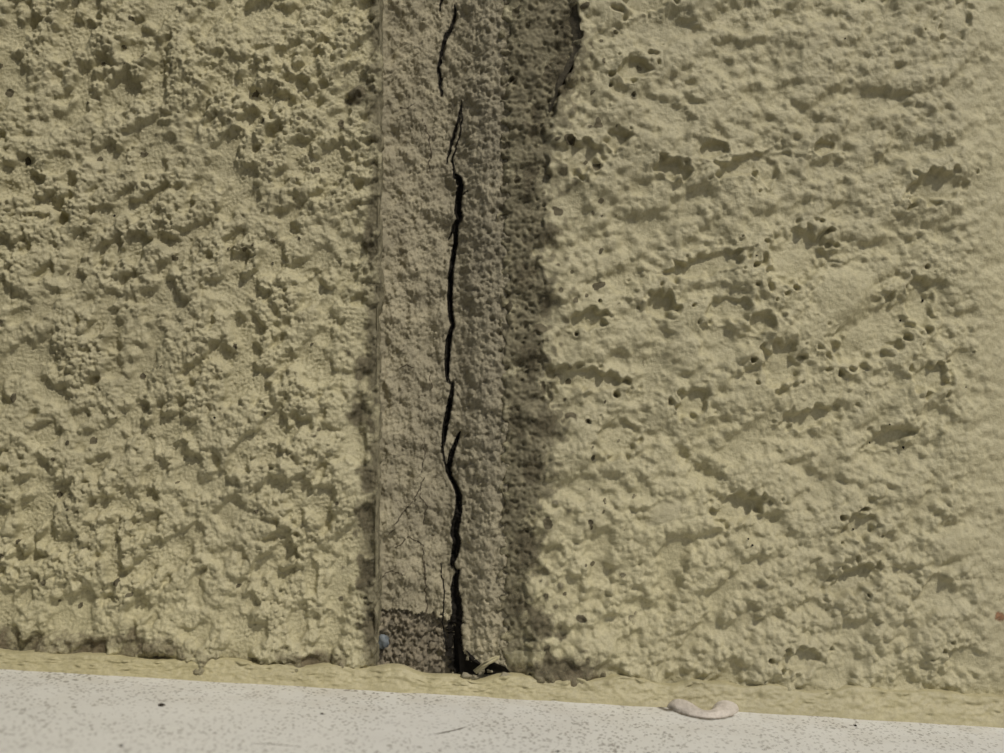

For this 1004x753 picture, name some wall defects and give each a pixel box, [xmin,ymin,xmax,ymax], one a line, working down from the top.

crack [382,0,468,674]